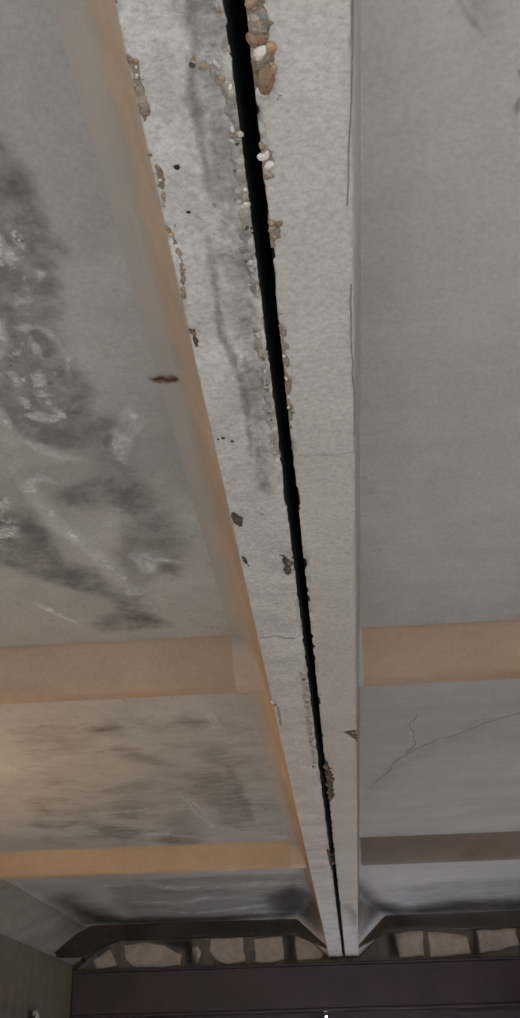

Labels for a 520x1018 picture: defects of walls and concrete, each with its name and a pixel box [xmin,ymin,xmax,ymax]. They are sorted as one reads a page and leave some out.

spalling [244,0,282,100]
crack [346,0,354,206]
spalling [189,44,261,298]
spalling [257,141,276,180]
spalling [268,214,283,248]
crack [298,283,356,456]
crack [370,712,520,787]